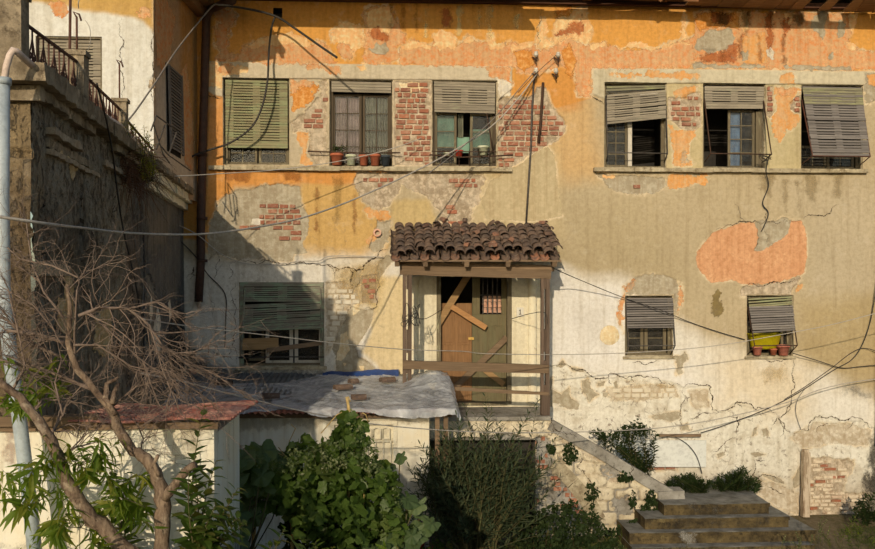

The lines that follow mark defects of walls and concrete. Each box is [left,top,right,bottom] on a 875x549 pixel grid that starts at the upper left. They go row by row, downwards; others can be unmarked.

peeling [207,5,875,372]
flaking render [544,352,710,410]
crack [553,359,869,452]
flaking render [757,422,871,515]